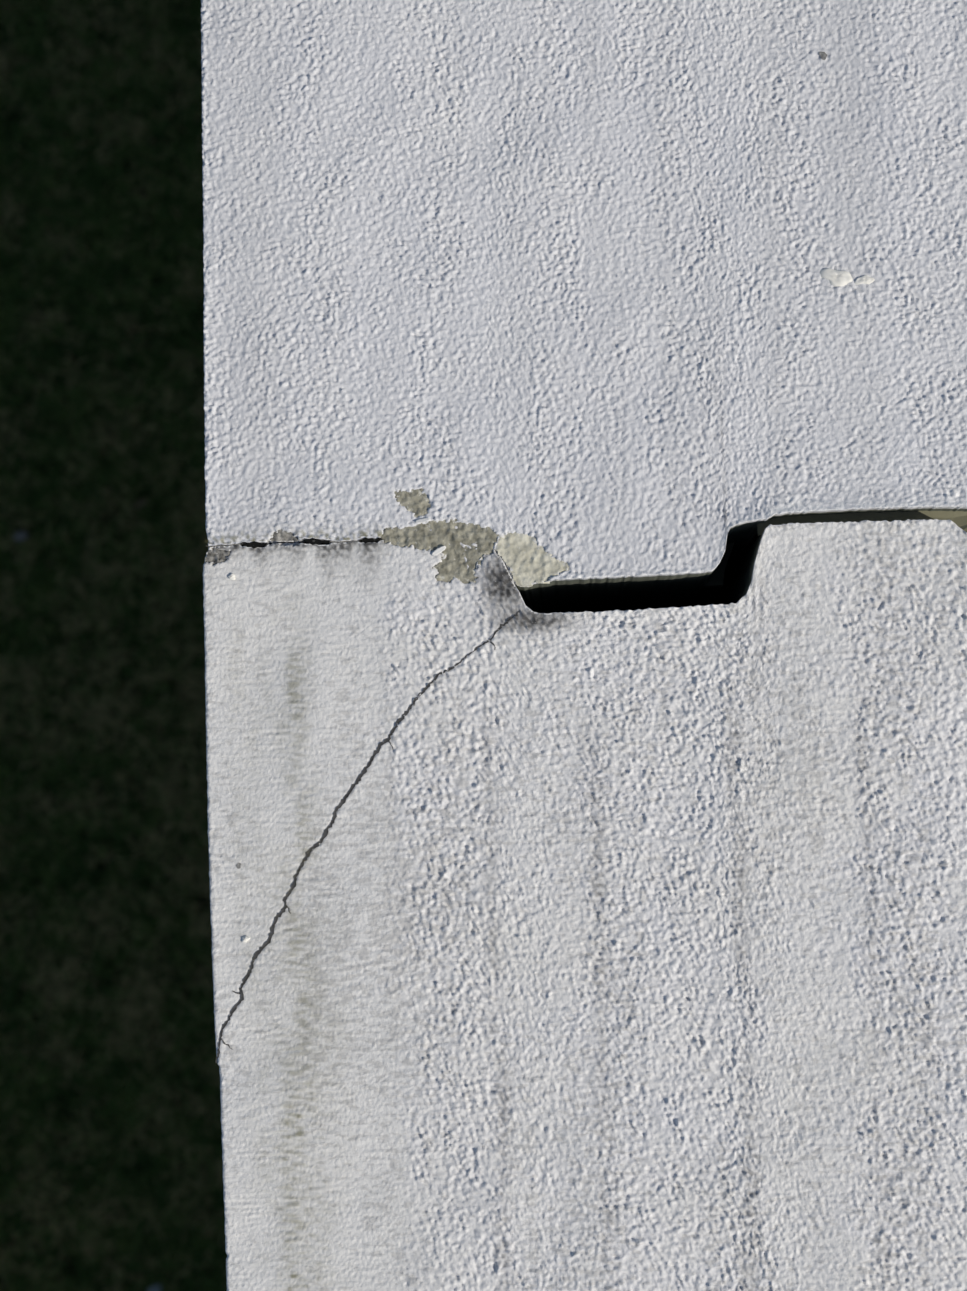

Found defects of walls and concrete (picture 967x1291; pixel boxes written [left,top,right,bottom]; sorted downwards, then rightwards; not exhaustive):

spalling [381,488,569,587]
crack [216,611,520,1063]